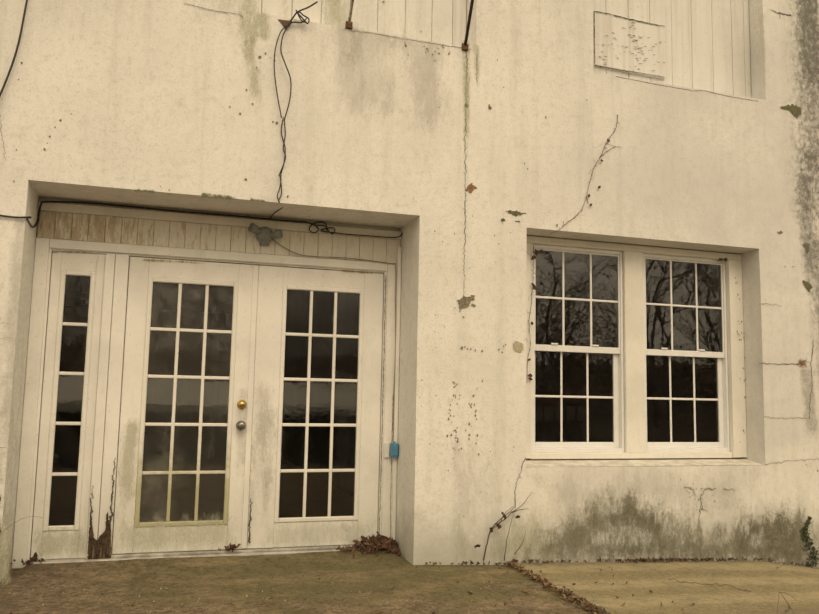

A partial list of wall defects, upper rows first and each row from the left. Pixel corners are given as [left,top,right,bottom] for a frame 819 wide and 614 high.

peeling [780,104,802,118]
crack [349,30,478,276]
water stain [801,169,819,275]
peeling [457,294,476,318]
water stain [541,495,808,565]